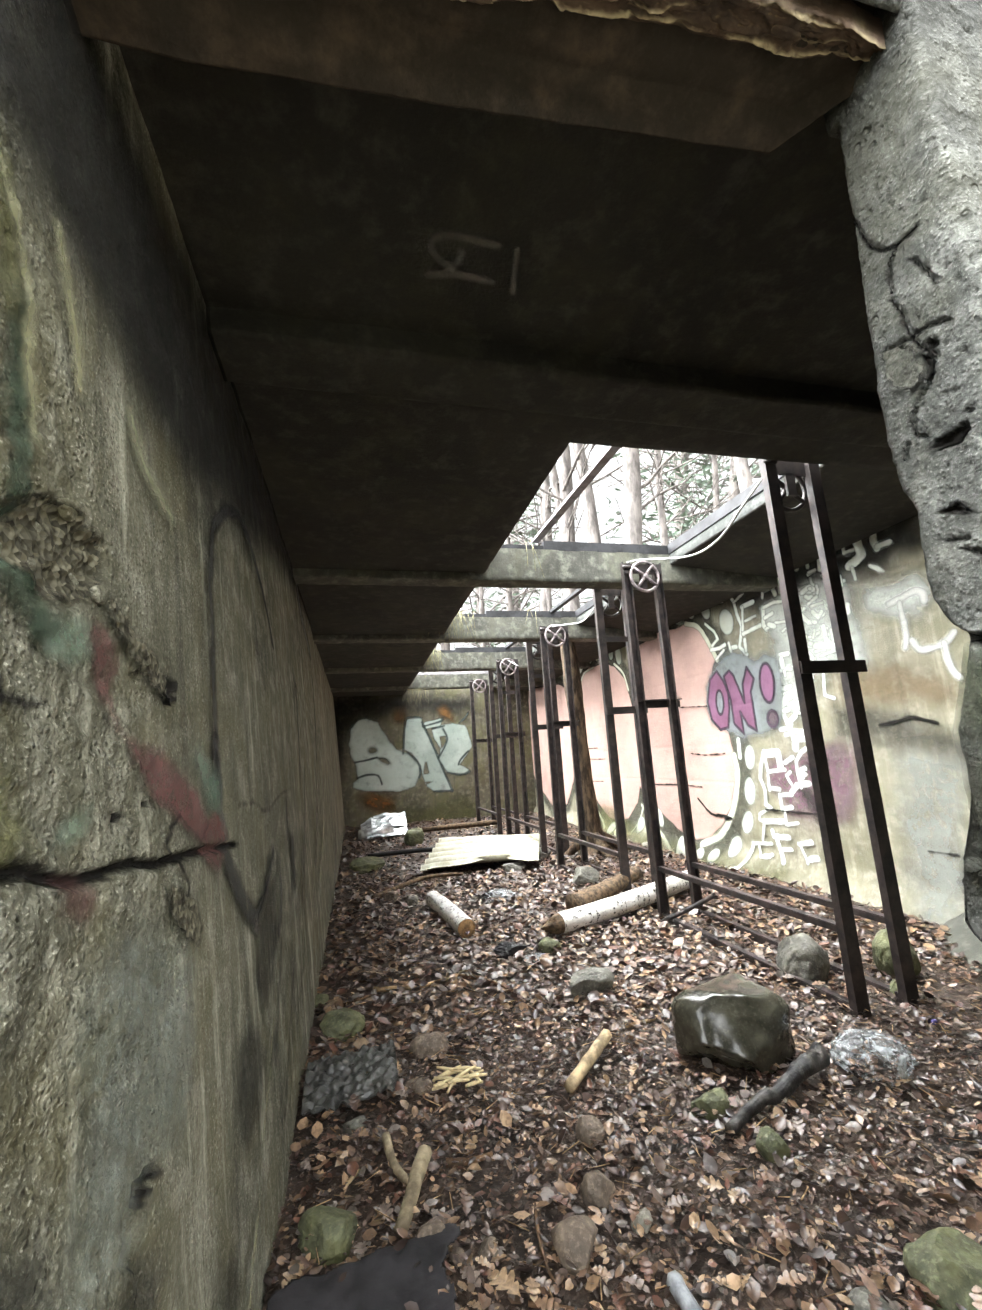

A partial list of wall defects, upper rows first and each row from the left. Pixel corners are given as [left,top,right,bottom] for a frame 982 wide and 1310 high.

spalling [550,0,886,62]
crack [851,216,951,461]
spalling [0,493,178,706]
crack [0,817,238,895]